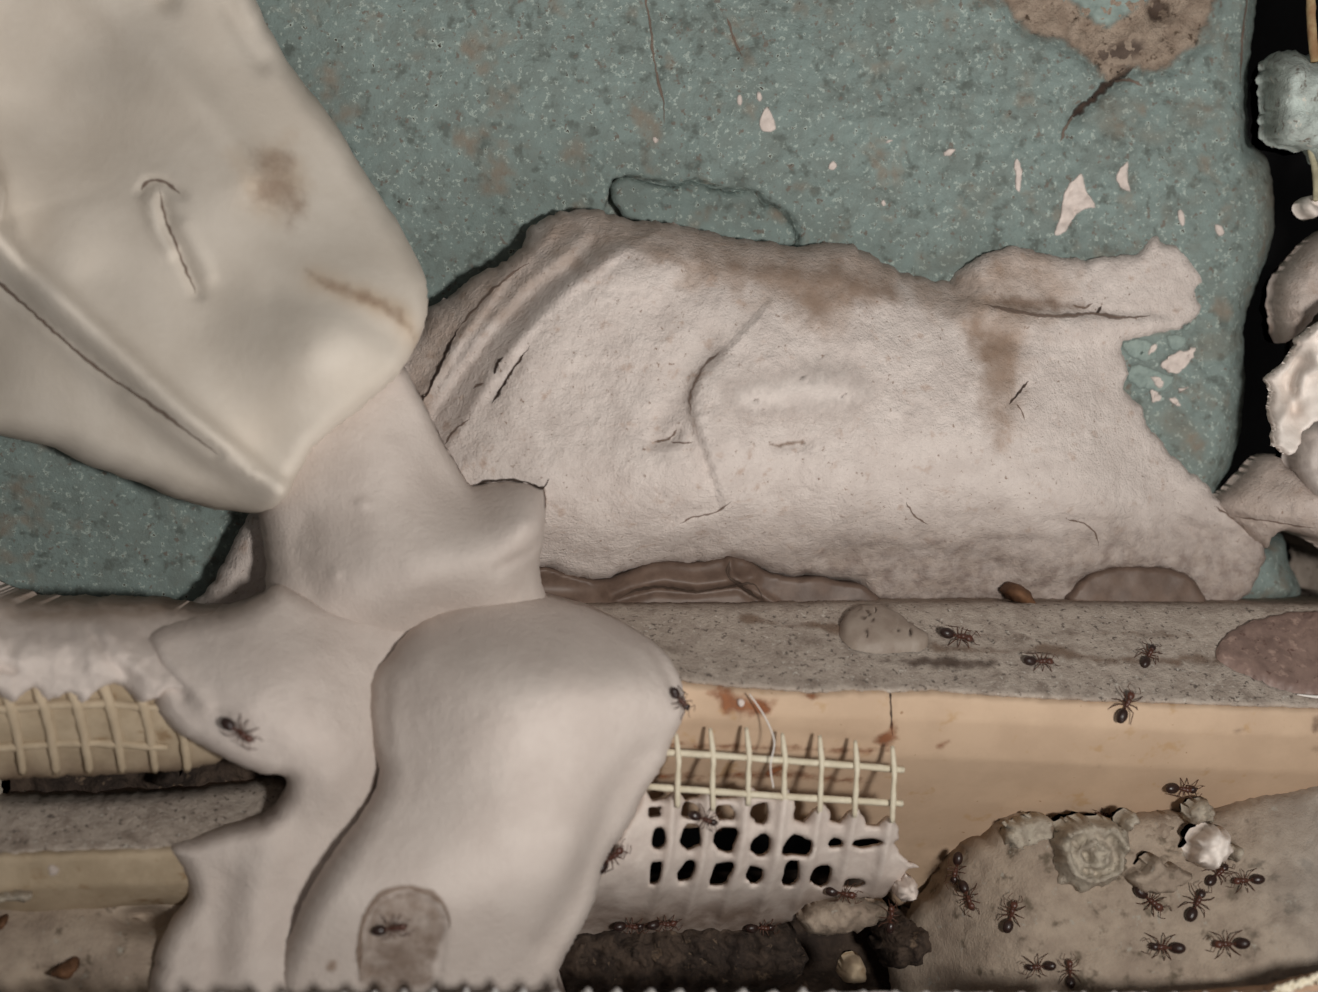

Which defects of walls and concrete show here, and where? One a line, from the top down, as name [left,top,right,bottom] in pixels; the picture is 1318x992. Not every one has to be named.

spalling [1002,0,1214,82]
crack [142,179,196,293]
peeling [610,176,796,246]
crack [0,283,217,454]
crack [410,263,549,509]
crack [656,353,718,444]
peeling [1122,323,1196,406]
crack [682,504,728,523]
peeling [795,897,889,936]